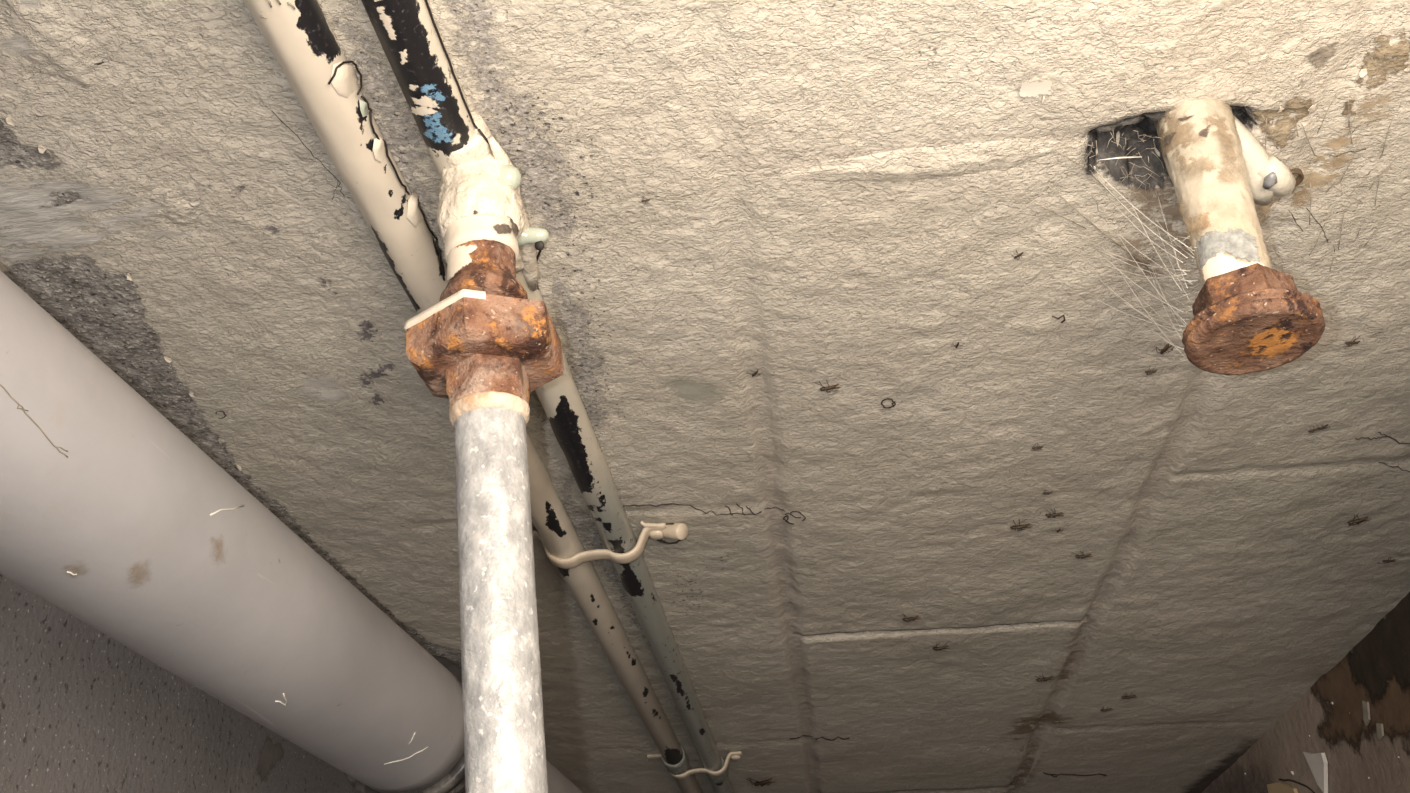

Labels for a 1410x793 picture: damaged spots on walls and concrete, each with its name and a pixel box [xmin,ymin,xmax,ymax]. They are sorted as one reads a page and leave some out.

peeling [1308,41,1338,69]
peeling [1342,28,1410,115]
peeling [0,116,60,170]
spalling [1086,111,1210,191]
peeling [1230,80,1316,148]
peeling [39,190,82,209]